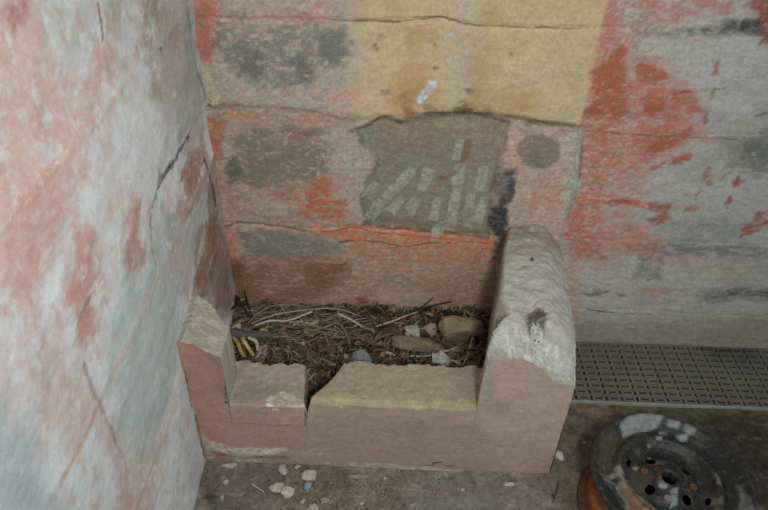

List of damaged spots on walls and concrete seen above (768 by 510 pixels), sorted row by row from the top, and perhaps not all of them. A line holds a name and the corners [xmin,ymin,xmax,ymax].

crack [332,16,577,29]
crack [155,132,190,199]
spalling [351,112,510,238]